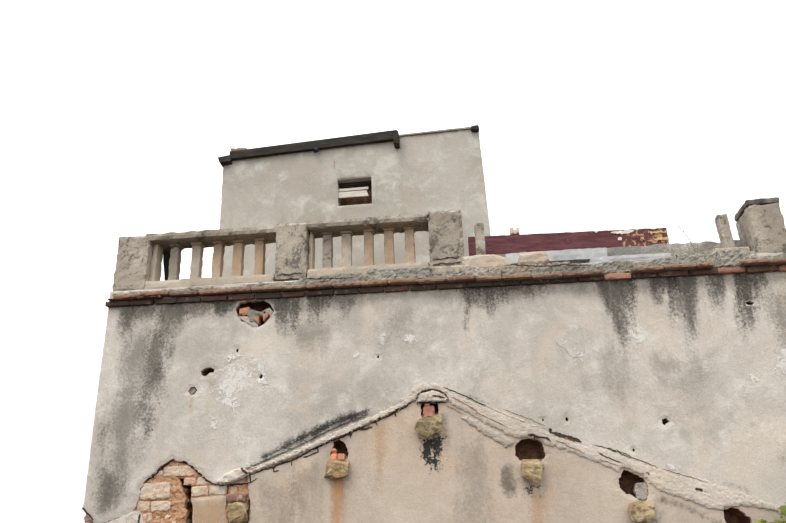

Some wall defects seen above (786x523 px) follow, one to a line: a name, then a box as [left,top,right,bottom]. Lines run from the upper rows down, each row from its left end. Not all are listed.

hole [237,303,274,327]
damp [599,279,634,344]
damp [650,275,696,330]
damp [707,274,725,302]
damp [734,273,767,325]
damp [141,303,205,406]
peeling [202,349,270,415]
crack [143,388,703,523]
damp [100,475,123,512]
flaking render [105,459,251,523]